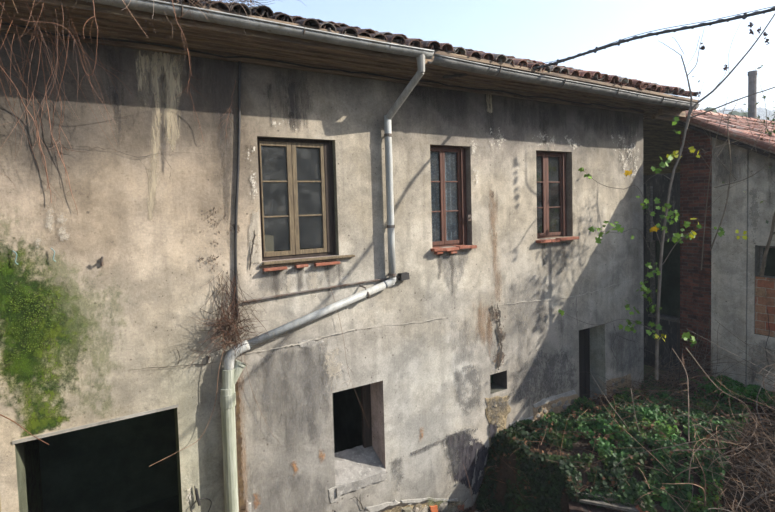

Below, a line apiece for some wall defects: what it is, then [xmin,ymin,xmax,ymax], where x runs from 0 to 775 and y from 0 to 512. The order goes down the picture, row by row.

damp [136,51,181,220]
crack [247,325,382,353]
crack [490,278,637,373]
flaking render [411,428,471,455]
damp [443,429,492,494]
flaking render [485,390,579,447]
flaking render [361,497,465,512]